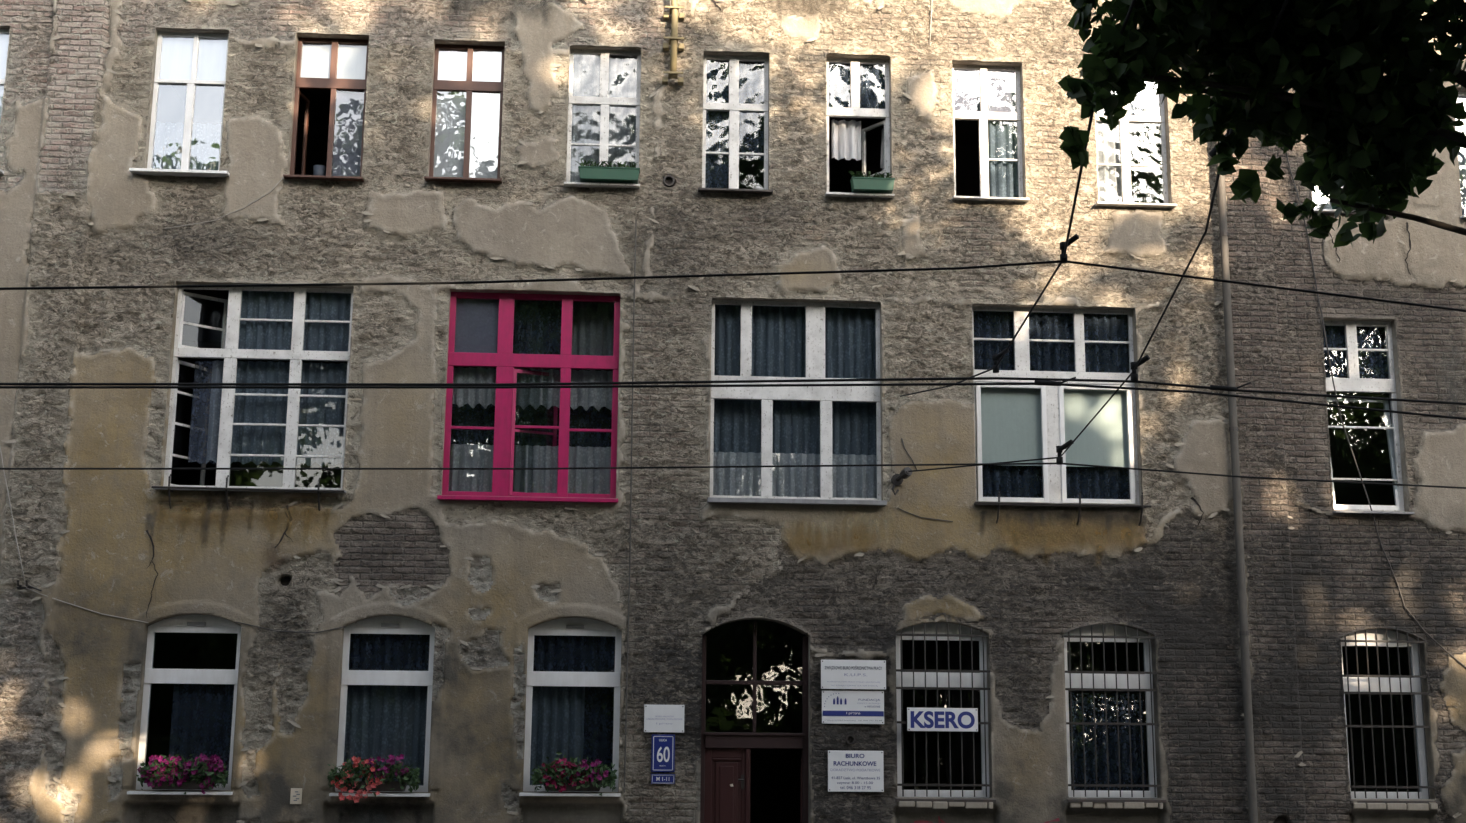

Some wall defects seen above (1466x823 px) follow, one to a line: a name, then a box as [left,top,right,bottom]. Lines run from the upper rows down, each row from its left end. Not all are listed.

flaking render [0,0,175,823]
flaking render [77,0,1249,823]